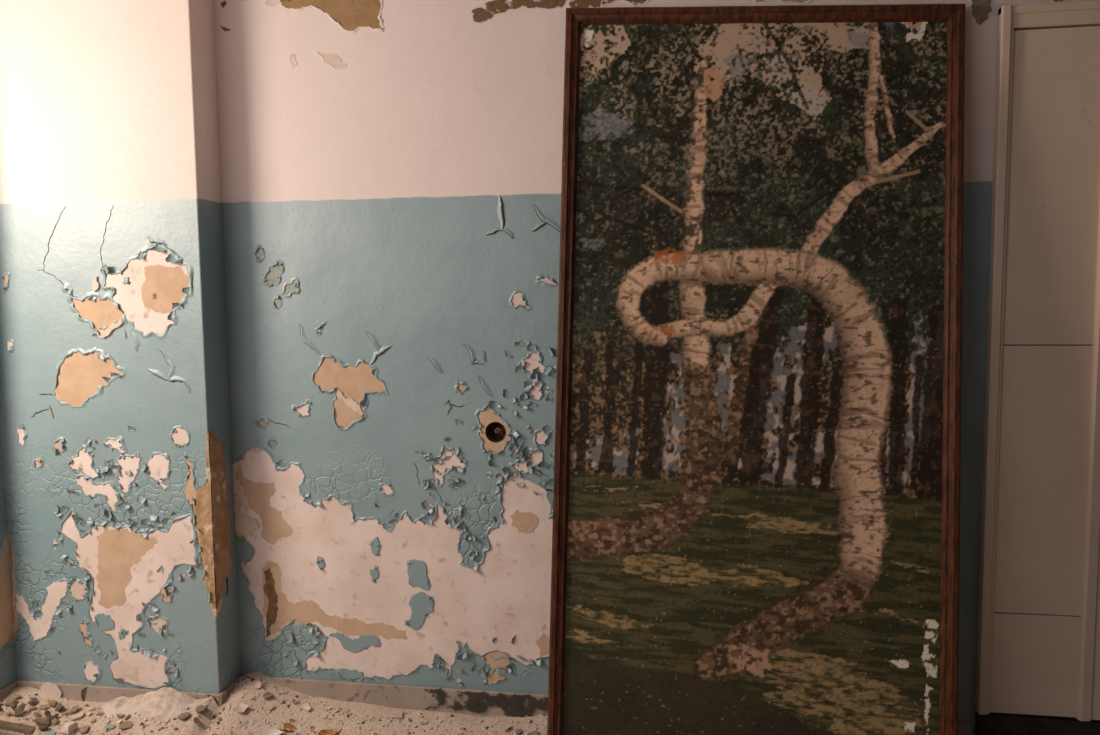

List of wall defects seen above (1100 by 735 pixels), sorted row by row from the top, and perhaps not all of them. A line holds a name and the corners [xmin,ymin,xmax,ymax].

flaking render [264,0,385,33]
crack [37,206,66,285]
peeling [52,244,194,408]
peeling [0,340,557,690]